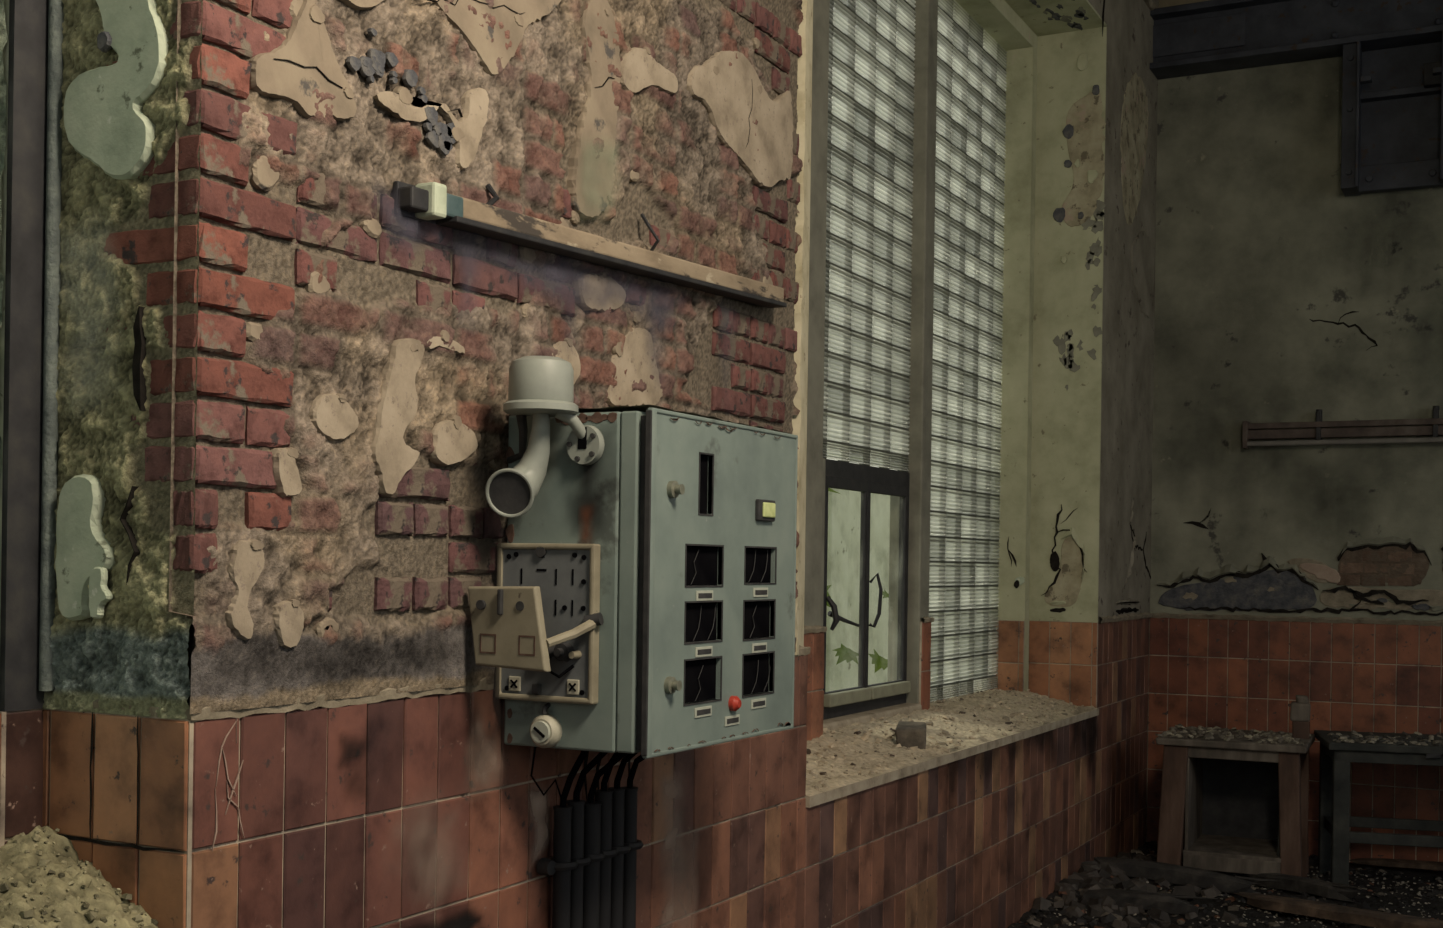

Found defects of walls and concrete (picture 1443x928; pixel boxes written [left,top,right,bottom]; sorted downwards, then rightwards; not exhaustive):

peeling [558,0,802,304]
crack [132,306,147,411]
spalling [55,0,663,649]
spalling [711,305,797,432]
crack [1310,311,1378,350]
crack [120,486,140,585]
flaking render [1044,526,1085,613]
flaking render [1116,598,1140,614]
flaking render [1287,536,1443,612]
crack [57,712,245,852]